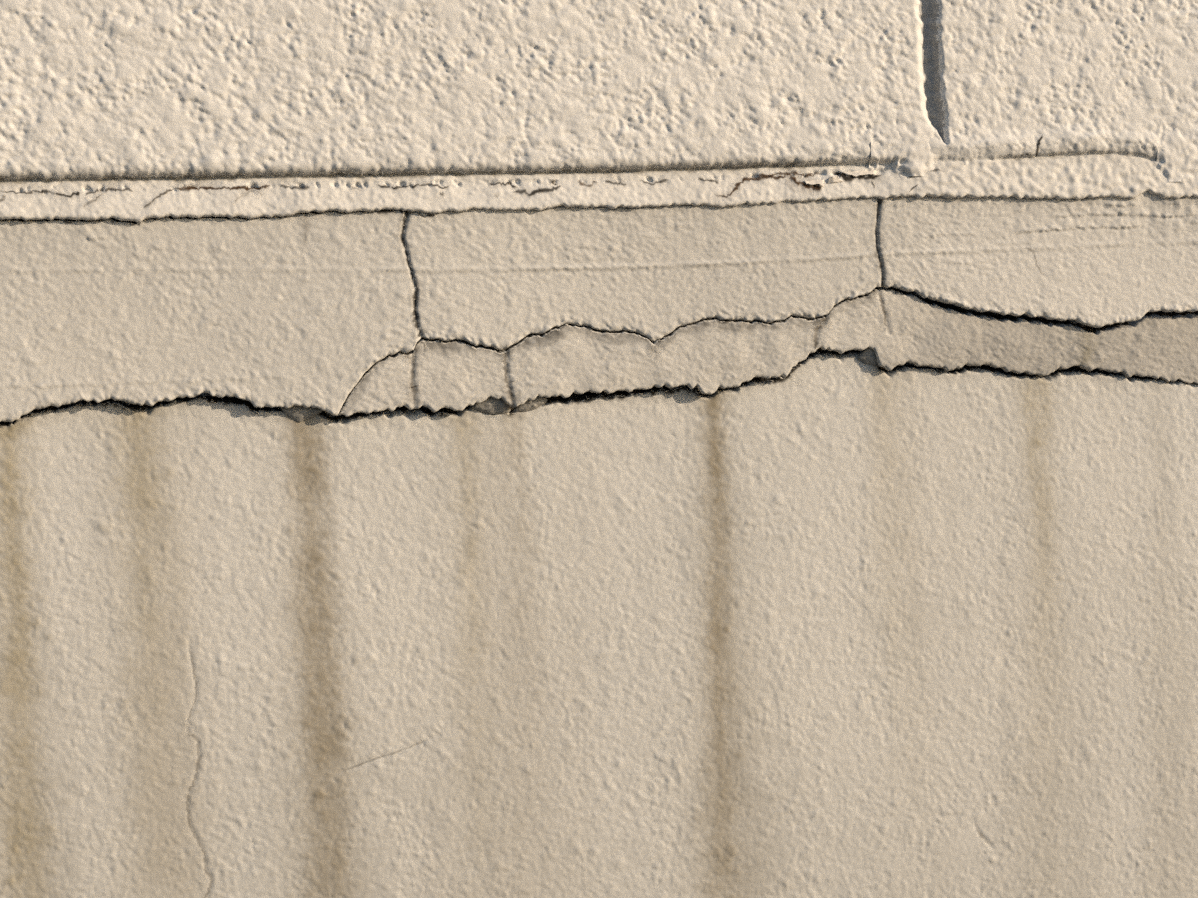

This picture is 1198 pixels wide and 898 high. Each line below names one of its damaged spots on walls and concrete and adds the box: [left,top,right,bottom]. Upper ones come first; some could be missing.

crack [490,179,671,210]
crack [0,184,1198,426]
crack [700,175,785,198]
flaking render [337,286,1198,417]
water stain [241,405,632,898]
water stain [651,381,826,898]
water stain [844,356,950,898]